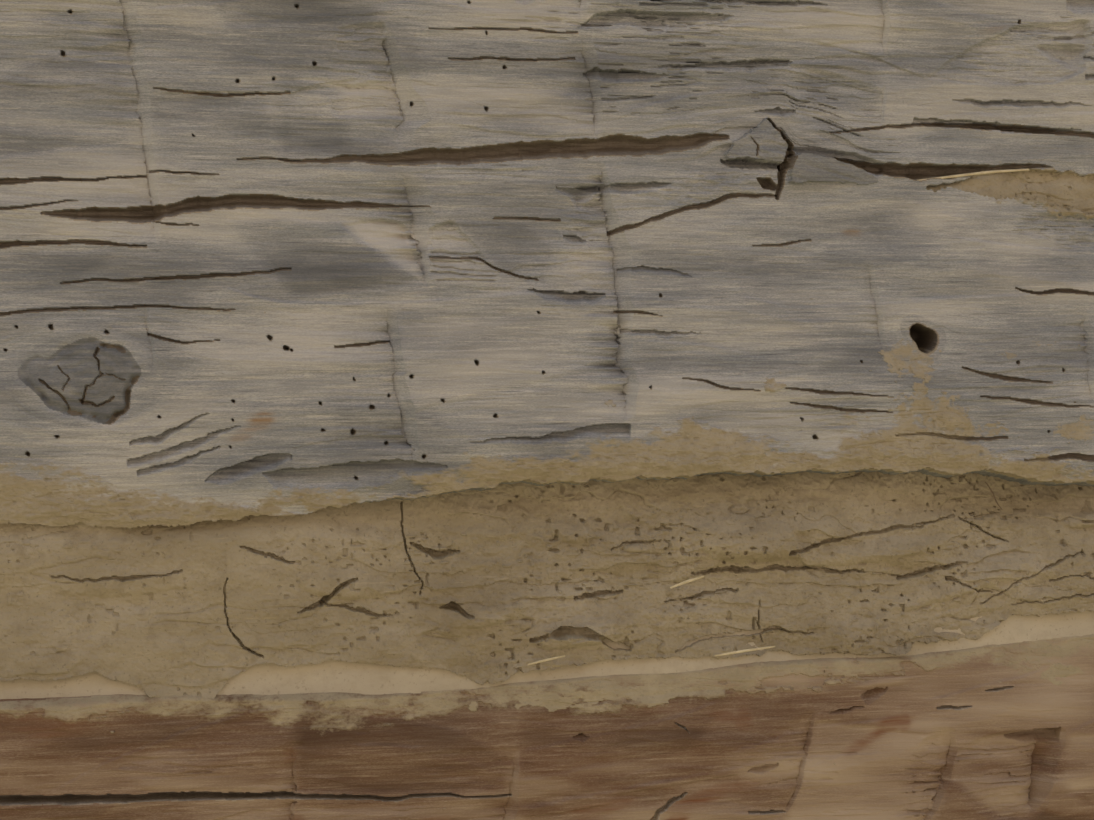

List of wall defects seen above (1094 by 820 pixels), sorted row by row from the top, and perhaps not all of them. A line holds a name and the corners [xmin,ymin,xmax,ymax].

crack [0,119,798,249]
crack [429,257,539,281]
crack [0,268,292,345]
crack [614,310,663,318]
crack [39,347,126,409]
crack [298,578,393,618]
peeling [852,676,912,688]
crack [0,791,512,806]